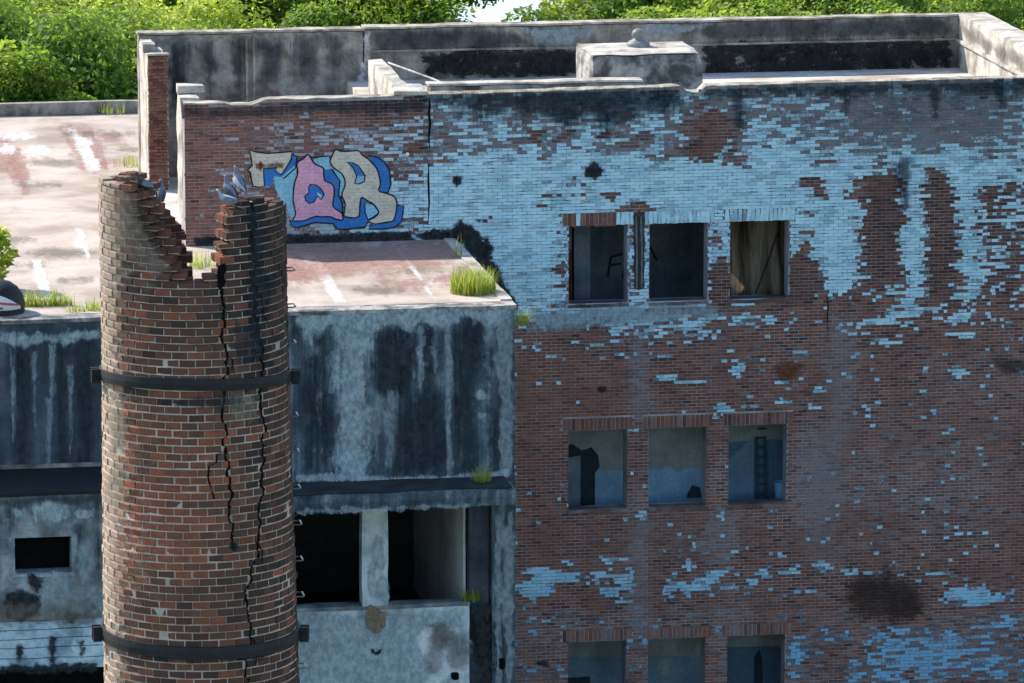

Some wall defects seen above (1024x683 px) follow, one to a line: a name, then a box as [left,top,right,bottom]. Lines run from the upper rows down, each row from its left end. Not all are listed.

water stain [359,28,591,81]
crack [425,98,433,223]
water stain [193,237,220,246]
peeling [921,168,963,300]
peeling [978,182,1024,298]
water stain [0,330,101,463]
crack [207,202,268,683]
water stain [286,220,518,482]
peeling [835,305,919,348]
peeling [298,534,470,683]
peeling [515,555,636,636]
peeling [662,555,735,598]